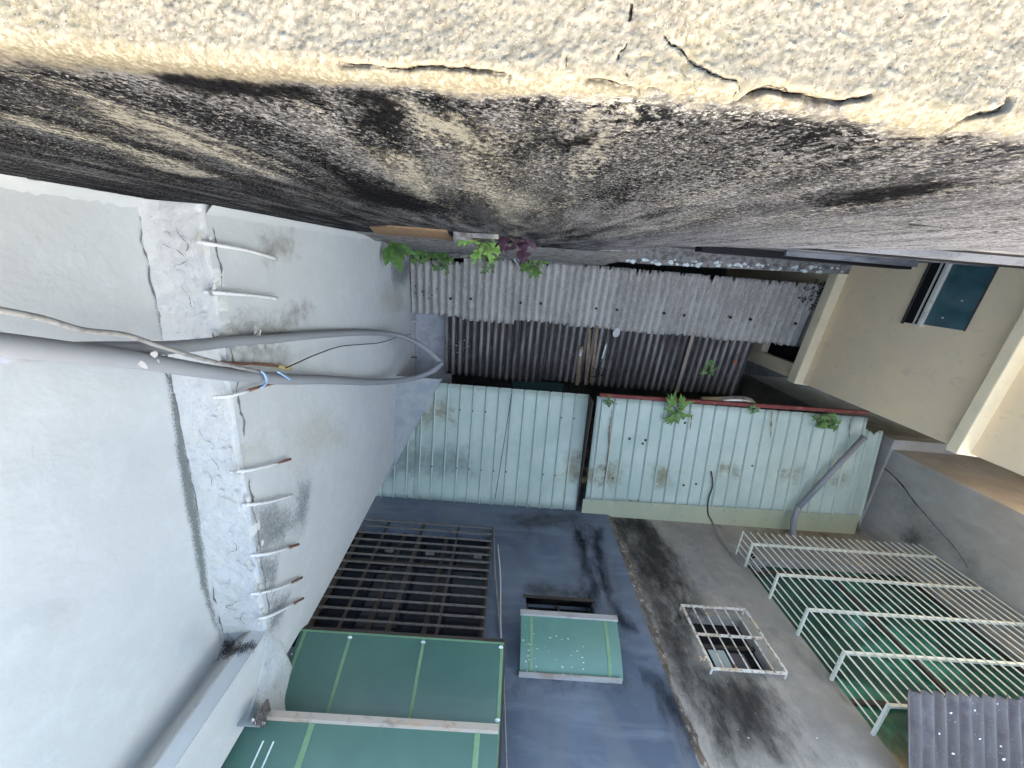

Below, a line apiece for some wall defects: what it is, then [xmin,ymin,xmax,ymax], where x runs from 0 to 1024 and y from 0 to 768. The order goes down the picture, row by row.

crack [351,64,507,74]
crack [664,36,862,102]
water stain [148,72,331,108]
water stain [340,89,409,143]
water stain [539,131,599,155]
water stain [301,151,461,215]
water stain [789,173,1006,209]
spalling [213,384,275,412]
spalling [230,458,292,480]
spalling [240,494,293,508]
spalling [245,540,300,566]
spalling [249,576,304,625]